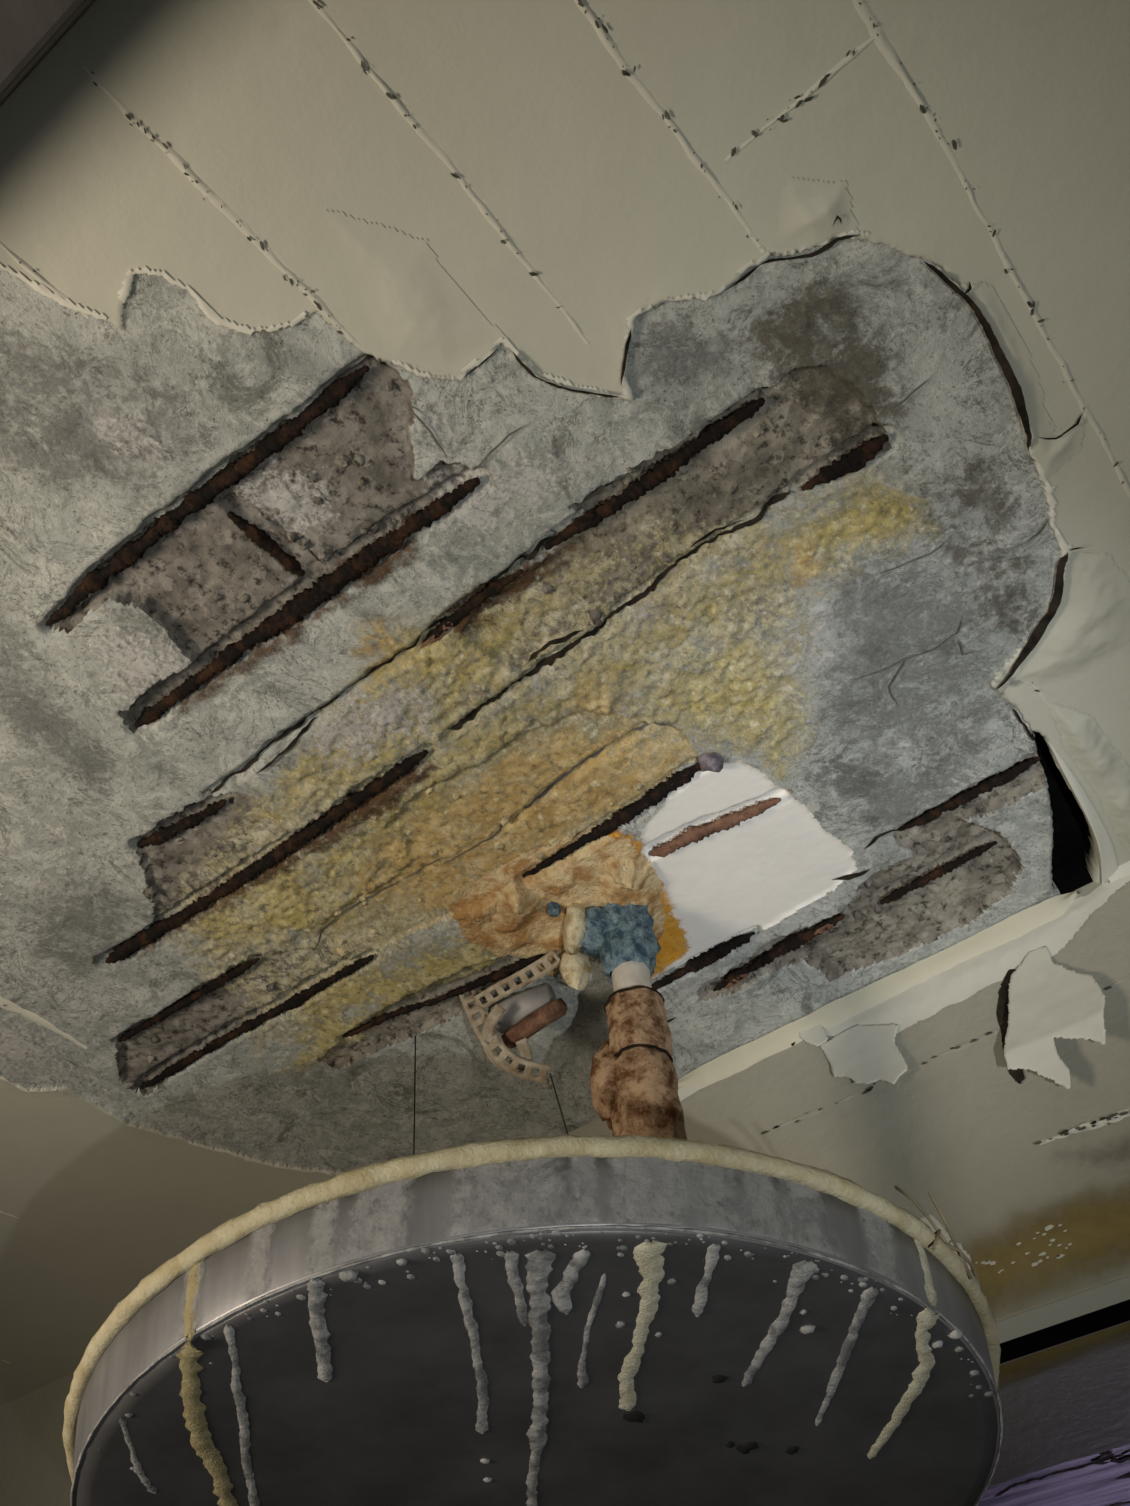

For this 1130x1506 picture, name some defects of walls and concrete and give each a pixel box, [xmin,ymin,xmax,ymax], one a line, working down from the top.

crack [725,215,858,291]
leakage [642,277,904,447]
crack [925,262,1085,451]
leakage [412,408,611,542]
rust [137,760,435,956]
crack [211,618,444,794]
crack [313,723,672,962]
rust [352,729,684,916]
peeling [0,229,1130,1176]
leakage [167,459,1036,1069]
rust [651,891,690,979]
peeling [920,1214,972,1270]